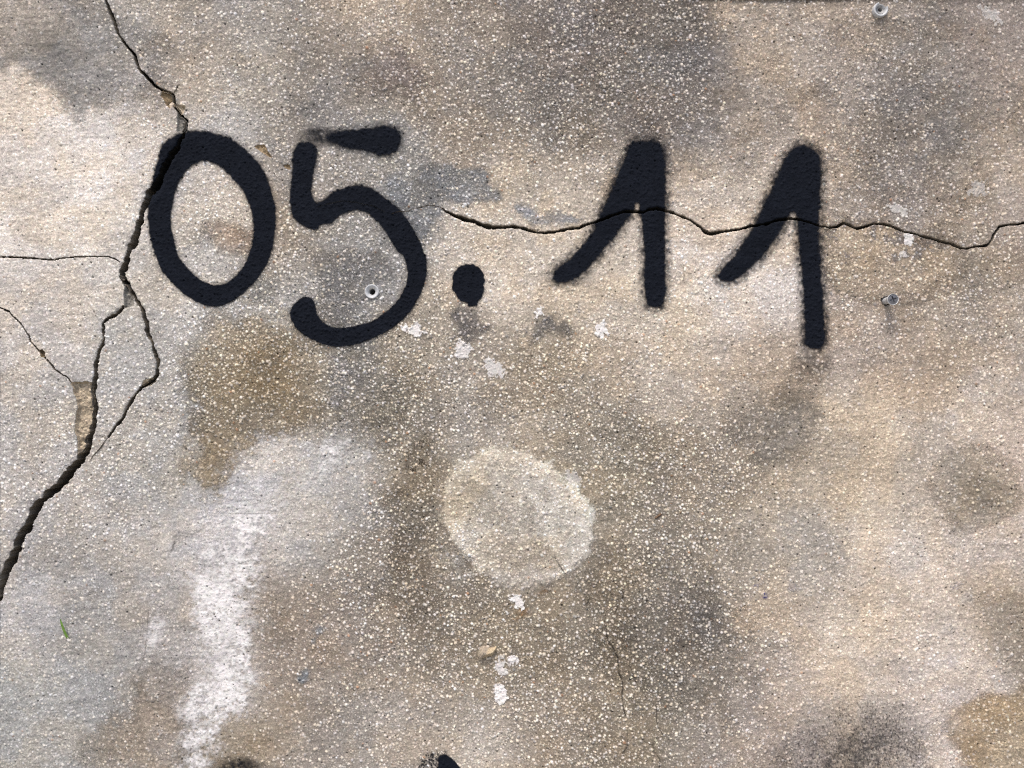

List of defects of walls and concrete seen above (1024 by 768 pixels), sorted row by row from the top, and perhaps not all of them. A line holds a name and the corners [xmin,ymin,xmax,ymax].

crack [0,0,189,601]
crack [319,201,1024,250]
damp [79,496,286,768]